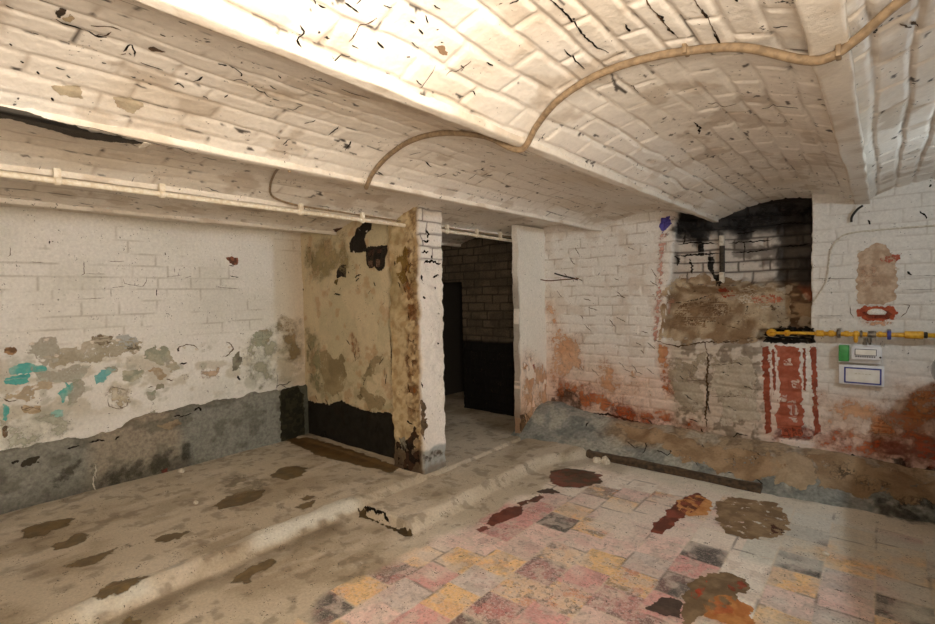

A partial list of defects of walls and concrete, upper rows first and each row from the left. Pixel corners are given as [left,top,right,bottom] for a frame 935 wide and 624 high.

spalling [334,245,388,295]
peeling [855,243,912,326]
peeling [3,334,199,421]
peeling [225,342,242,380]
peeling [357,356,387,410]
spalling [636,243,821,440]
spalling [11,456,40,467]
water stain [54,443,191,490]
water stain [212,476,265,510]
water stain [270,466,308,480]
spalling [396,400,428,471]
spalling [616,423,788,481]